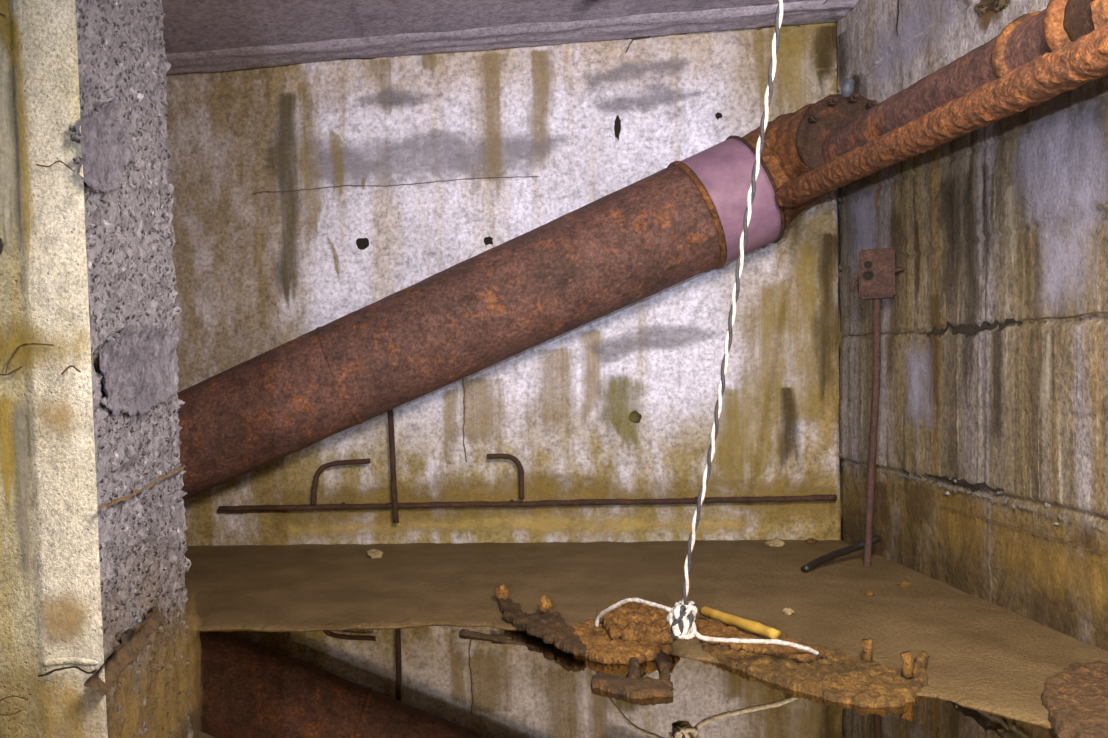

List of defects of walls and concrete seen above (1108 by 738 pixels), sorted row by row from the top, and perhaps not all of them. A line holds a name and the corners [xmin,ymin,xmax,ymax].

spalling [974,0,1010,17]
damp [816,26,862,95]
damp [0,56,22,243]
damp [272,94,297,301]
crack [0,343,81,376]
damp [931,172,985,401]
crack [848,311,1108,336]
damp [1042,334,1051,409]
damp [781,388,796,458]
spalling [839,453,1103,530]
crack [0,629,136,716]
damp [110,609,201,738]